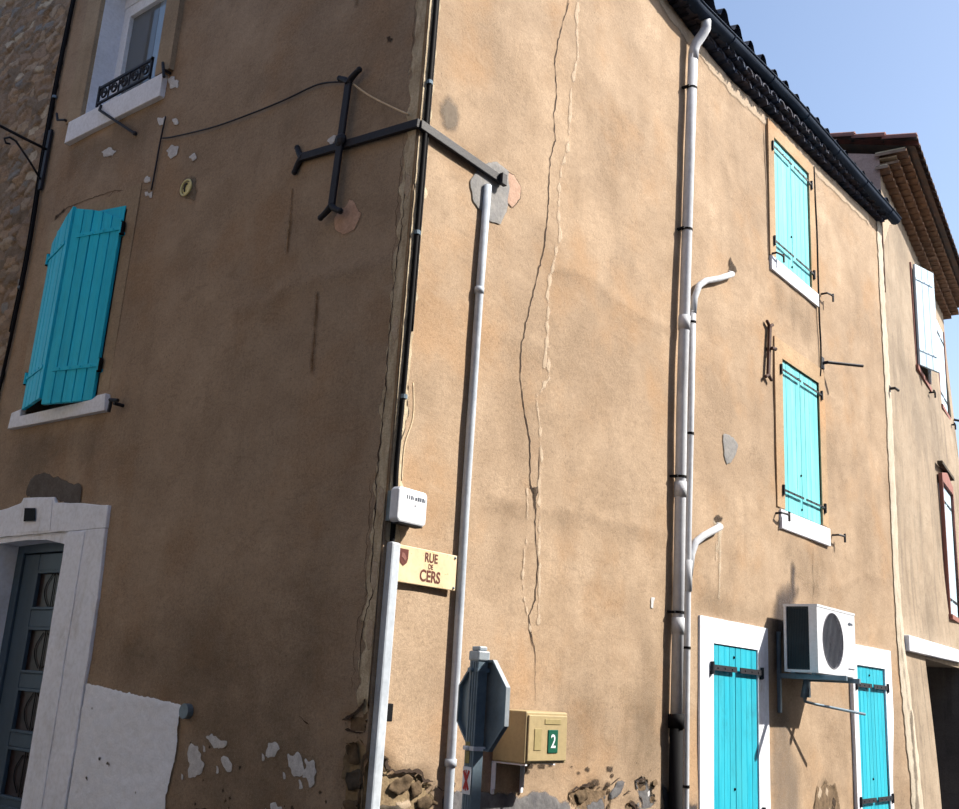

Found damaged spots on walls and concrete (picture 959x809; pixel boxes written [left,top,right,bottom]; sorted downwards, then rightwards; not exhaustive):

crack [520,2,580,701]
peeling [341,0,441,809]
peeling [181,734,241,781]
peeling [262,742,326,803]
flaking render [568,766,658,809]
flaking render [814,779,840,809]